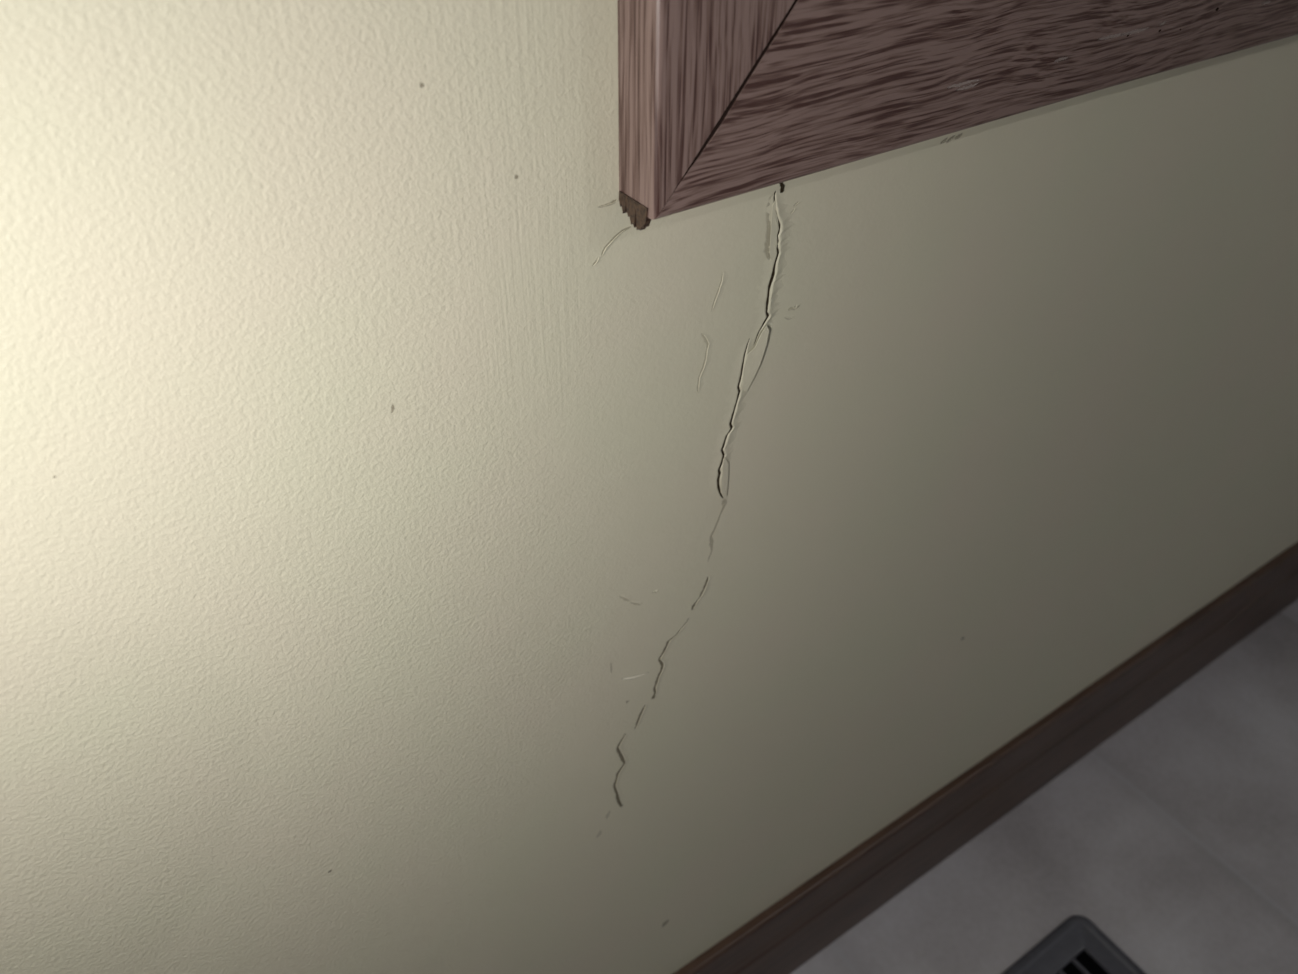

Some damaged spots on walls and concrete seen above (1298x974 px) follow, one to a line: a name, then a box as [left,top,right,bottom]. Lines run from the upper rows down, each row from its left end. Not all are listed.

crack [707,182,795,500]
crack [613,575,715,807]